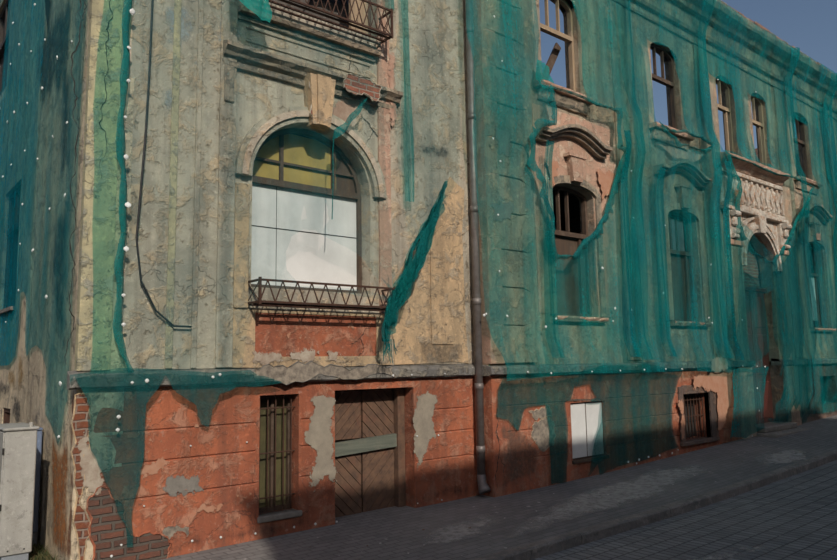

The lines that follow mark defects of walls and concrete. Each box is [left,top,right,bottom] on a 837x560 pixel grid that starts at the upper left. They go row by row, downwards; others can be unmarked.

water stain [40,3,70,167]
crack [99,0,113,177]
crack [65,0,87,363]
water stain [53,217,66,329]
spalling [70,392,190,560]
spalling [239,342,397,385]
peeling [304,395,338,492]
peeling [412,391,438,471]
peeling [693,357,732,430]